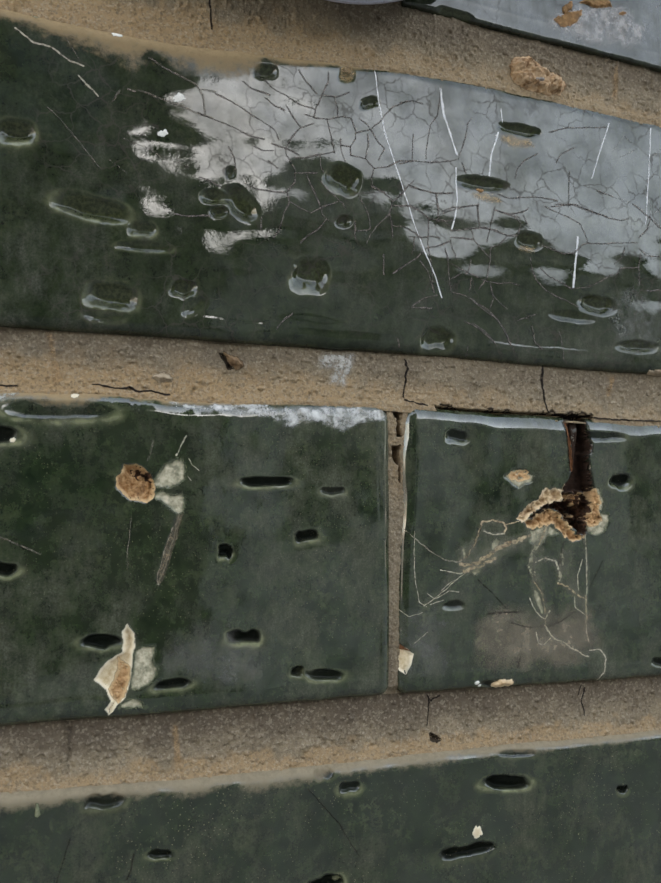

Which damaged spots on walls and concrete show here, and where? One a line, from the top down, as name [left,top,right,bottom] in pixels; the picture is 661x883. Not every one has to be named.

spalling [554,0,626,27]
crack [15,27,661,424]
peeling [116,459,185,584]
peeling [505,469,534,488]
spalling [516,418,625,544]
spalling [609,472,632,489]
crack [404,519,606,716]
peeling [80,624,192,715]
crack [426,694,440,726]